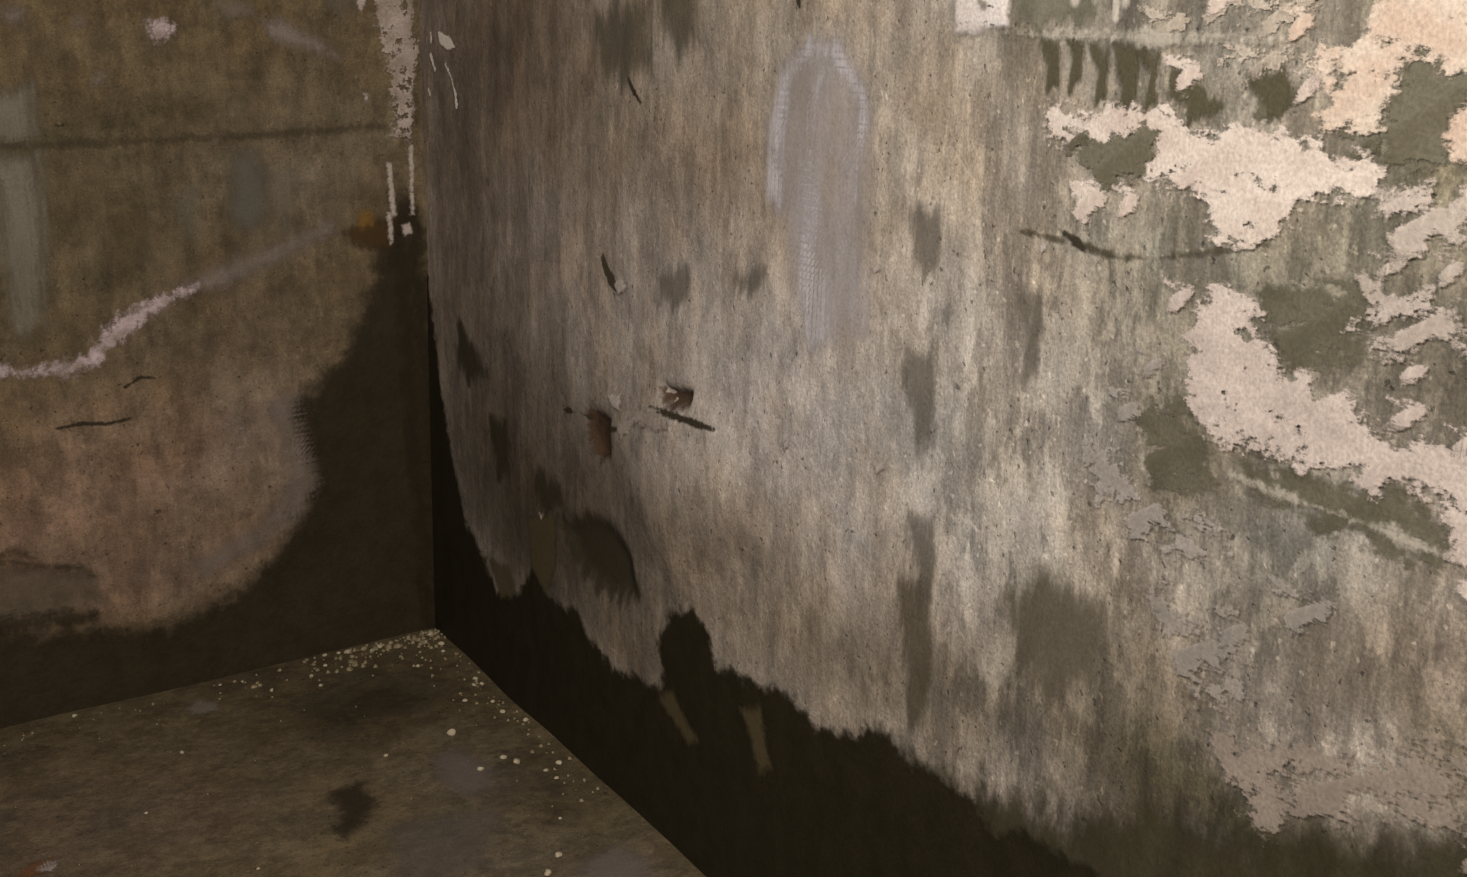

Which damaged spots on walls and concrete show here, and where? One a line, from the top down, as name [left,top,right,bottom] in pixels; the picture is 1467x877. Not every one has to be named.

damp [0,196,1467,877]
peeling [954,0,1009,34]
crack [1020,229,1267,260]
peeling [1043,0,1467,600]